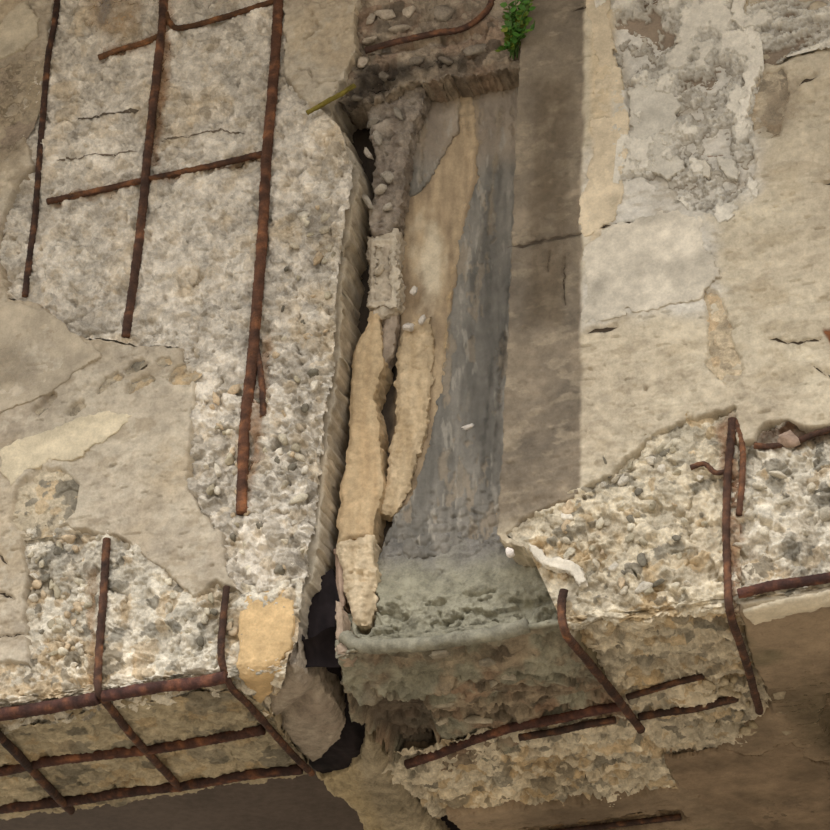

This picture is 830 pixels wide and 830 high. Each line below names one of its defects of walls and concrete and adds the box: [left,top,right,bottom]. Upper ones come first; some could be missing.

crack [78,108,139,120]
crack [162,128,244,142]
damp [459,96,478,180]
crack [58,150,136,161]
spalling [0,0,353,820]
spalling [333,0,830,819]
corrosion [759,421,830,447]